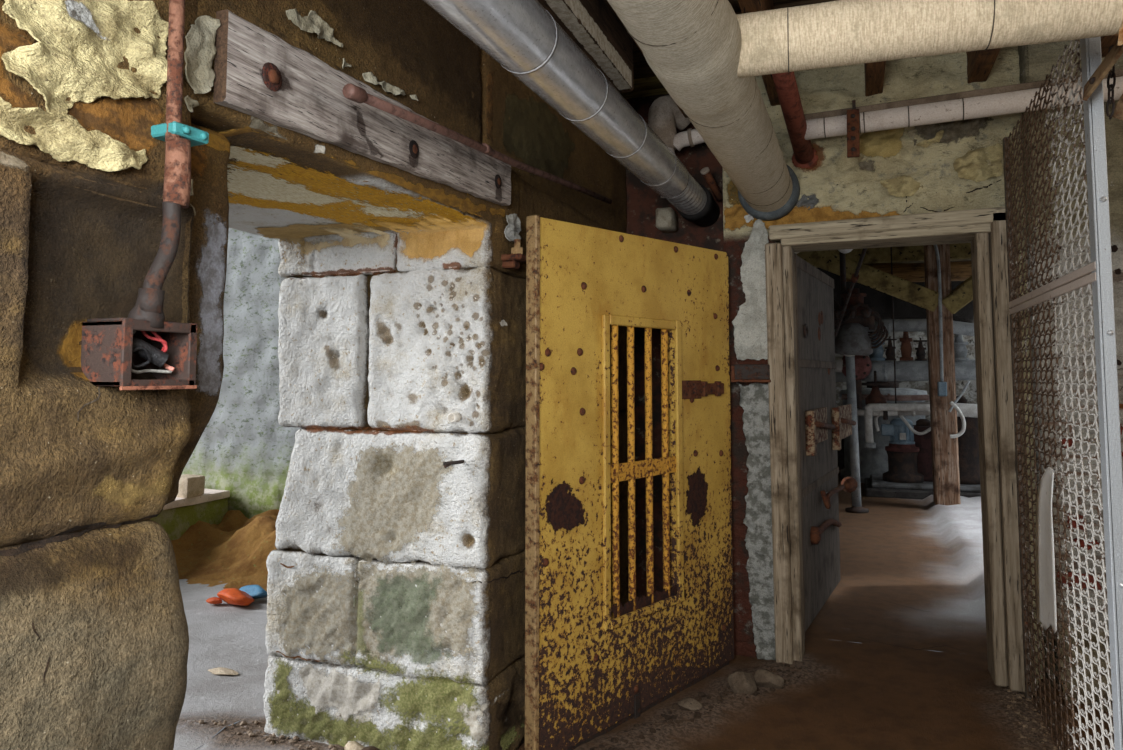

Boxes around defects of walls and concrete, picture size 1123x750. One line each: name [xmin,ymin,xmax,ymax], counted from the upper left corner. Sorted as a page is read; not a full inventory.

peeling [0,0,168,172]
peeling [184,8,521,241]
spalling [858,117,993,172]
spalling [795,194,819,210]
crack [0,509,163,556]
corrosion [545,479,585,534]
corrosion [685,466,708,527]
corrosion [611,585,687,630]
damp [457,695,501,741]